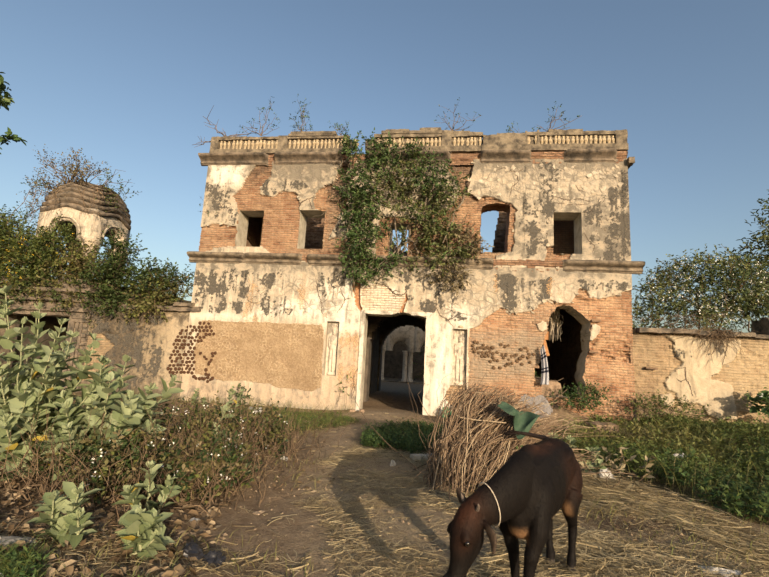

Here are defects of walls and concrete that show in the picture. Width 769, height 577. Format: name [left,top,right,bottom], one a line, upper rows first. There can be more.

flaking render [199,165,356,255]
flaking render [375,162,624,259]
leakage [519,160,561,258]
leakage [583,170,631,261]
leakage [194,269,293,316]
leakage [318,272,347,296]
flaking render [360,285,407,311]
leakage [495,274,552,311]
leakage [578,279,628,296]
flaking render [445,288,636,422]